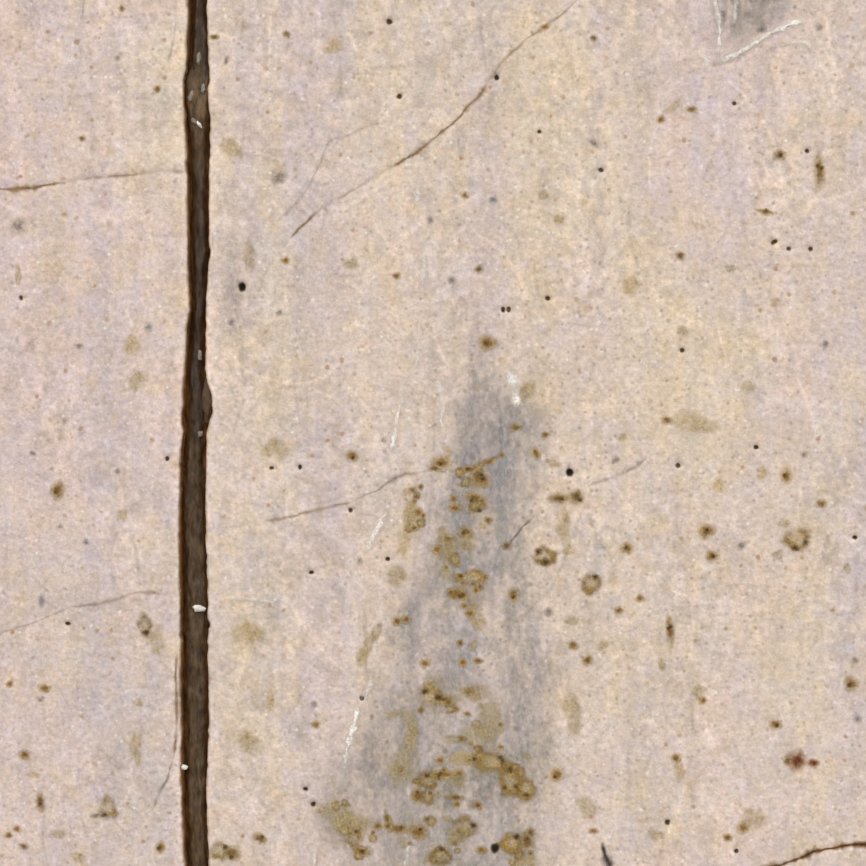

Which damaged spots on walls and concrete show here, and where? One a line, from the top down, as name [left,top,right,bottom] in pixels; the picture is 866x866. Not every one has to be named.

crack [395,88,485,165]
crack [601,844,612,866]
crack [770,842,866,866]